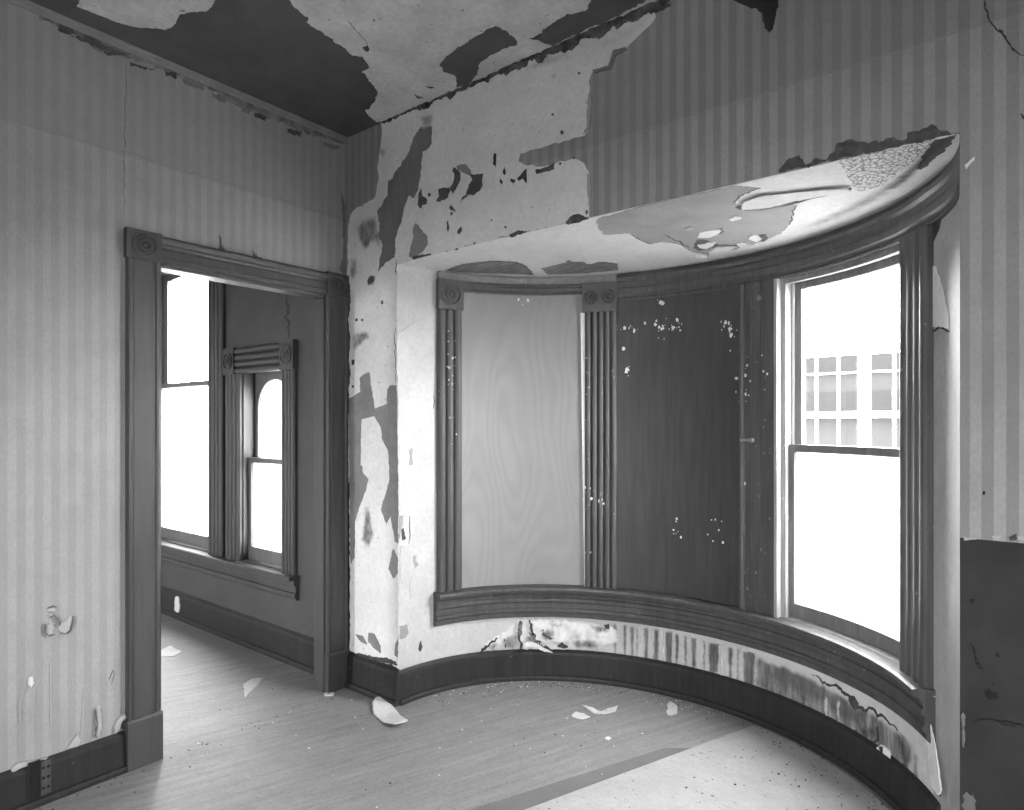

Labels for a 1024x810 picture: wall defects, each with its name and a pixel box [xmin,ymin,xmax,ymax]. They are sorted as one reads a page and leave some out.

crack [347,19,375,52]
crack [984,0,1024,56]
crack [839,140,934,191]
peeling [932,266,950,332]
flaking render [347,13,852,667]
leakage [614,625,695,667]
leakage [709,644,910,767]